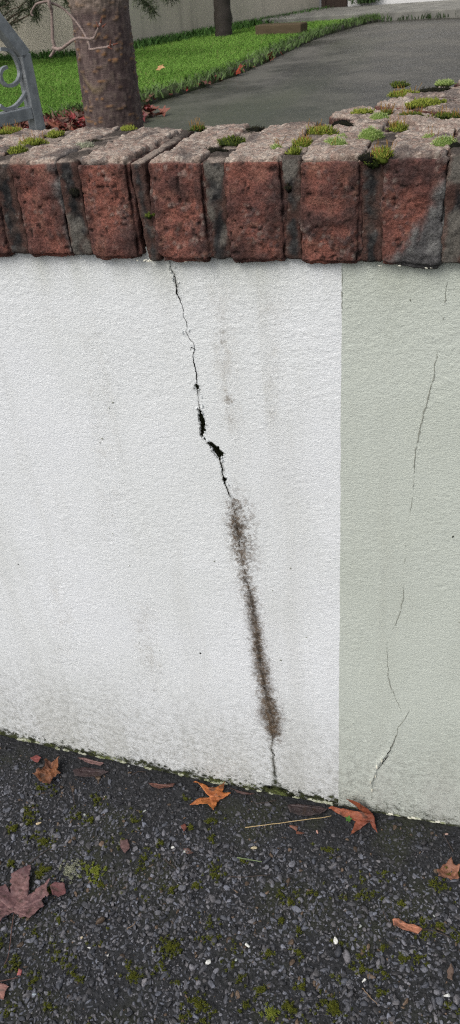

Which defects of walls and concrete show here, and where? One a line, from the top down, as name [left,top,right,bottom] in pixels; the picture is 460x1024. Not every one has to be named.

crack [168,262,252,598]
crack [410,350,437,509]
damp [231,499,280,741]